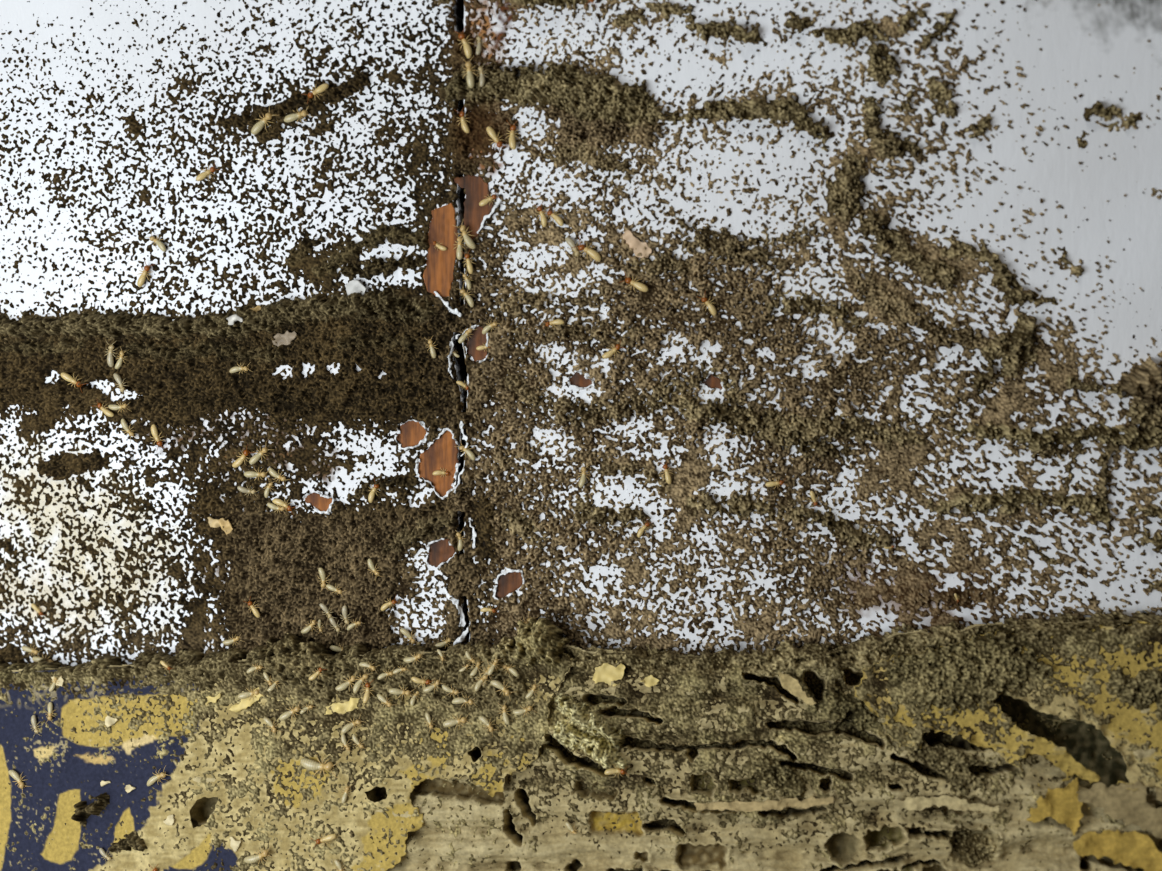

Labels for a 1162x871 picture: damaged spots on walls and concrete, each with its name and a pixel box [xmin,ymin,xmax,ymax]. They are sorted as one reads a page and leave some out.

crack [453,0,464,32]
crack [457,100,465,118]
peeling [423,175,494,297]
crack [432,174,501,554]
peeling [394,419,461,500]
peeling [425,538,456,569]
peeling [492,568,525,600]
crack [441,587,484,646]